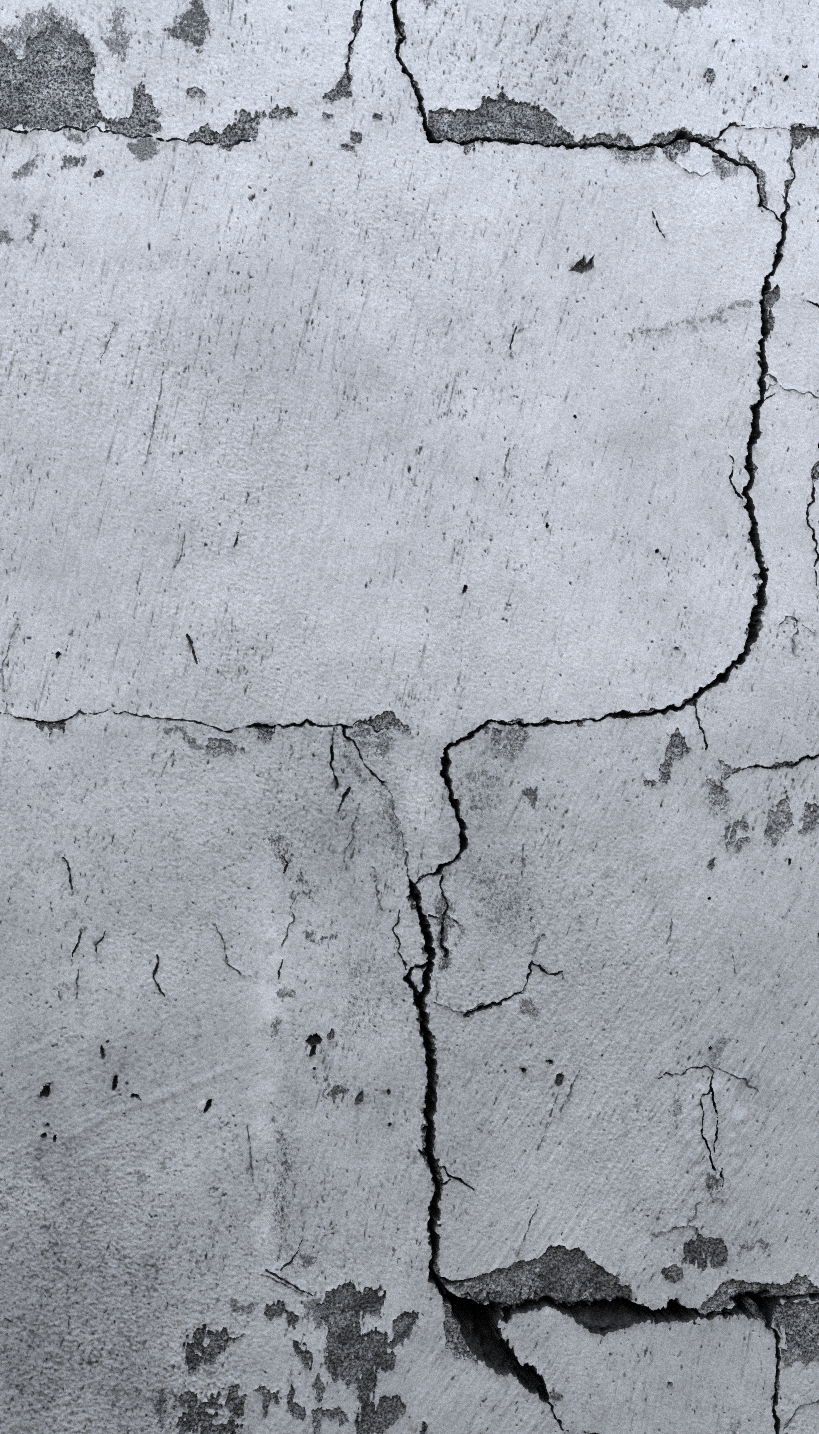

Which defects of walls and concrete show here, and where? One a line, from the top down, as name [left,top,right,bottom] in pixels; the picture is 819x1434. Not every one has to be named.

peeling [0,13,162,138]
crack [0,125,256,148]
peeling [183,104,298,151]
peeling [428,83,768,206]
crack [245,0,819,1297]
crack [0,702,239,734]
crack [215,923,251,977]
peeling [173,1279,419,1434]
peeling [450,1245,637,1304]
crack [548,1402,598,1434]
peeling [661,1233,819,1358]
crack [701,1292,819,1434]